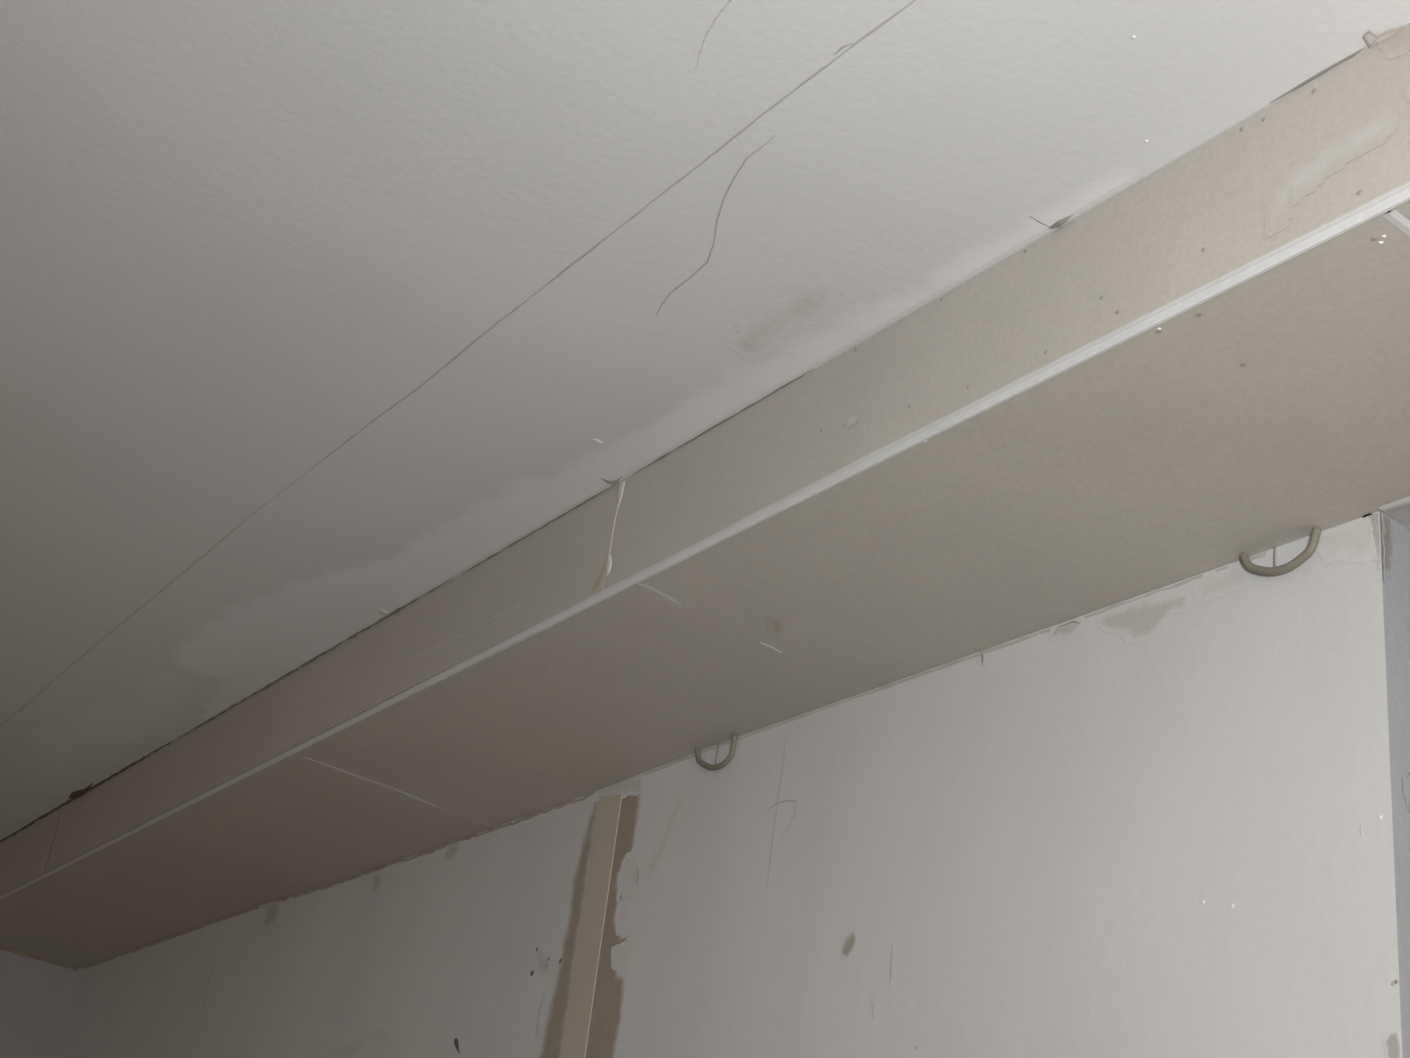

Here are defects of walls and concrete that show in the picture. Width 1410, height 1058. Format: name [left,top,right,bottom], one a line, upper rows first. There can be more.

crack [0,0,916,726]
crack [0,369,813,891]
spalling [1049,616,1084,642]